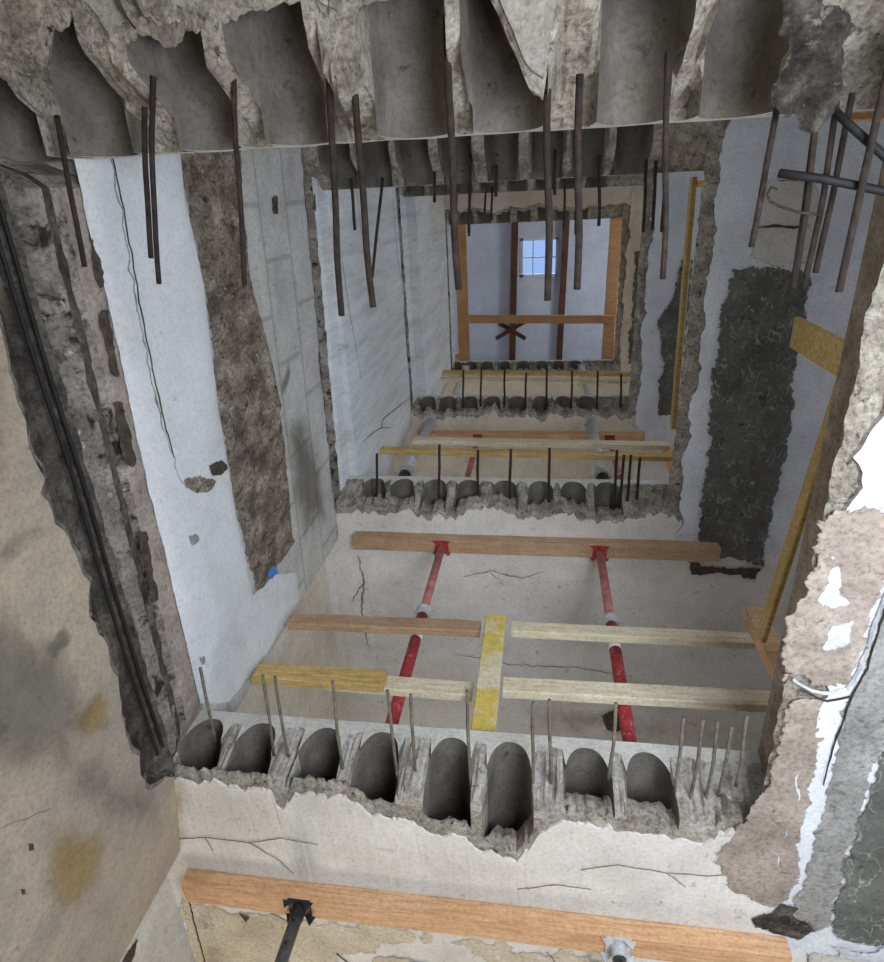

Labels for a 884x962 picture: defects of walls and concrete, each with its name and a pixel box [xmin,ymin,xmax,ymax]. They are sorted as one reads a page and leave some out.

spalling [770,0,857,133]
spalling [88,228,104,288]
spalling [99,309,120,378]
crack [110,158,191,488]
flaking render [657,260,693,416]
flaking render [688,178,826,580]
peeling [715,506,884,947]
crack [800,610,884,786]
peeling [179,898,287,962]
crack [179,837,318,874]
peeling [288,920,433,962]
crack [518,864,724,890]